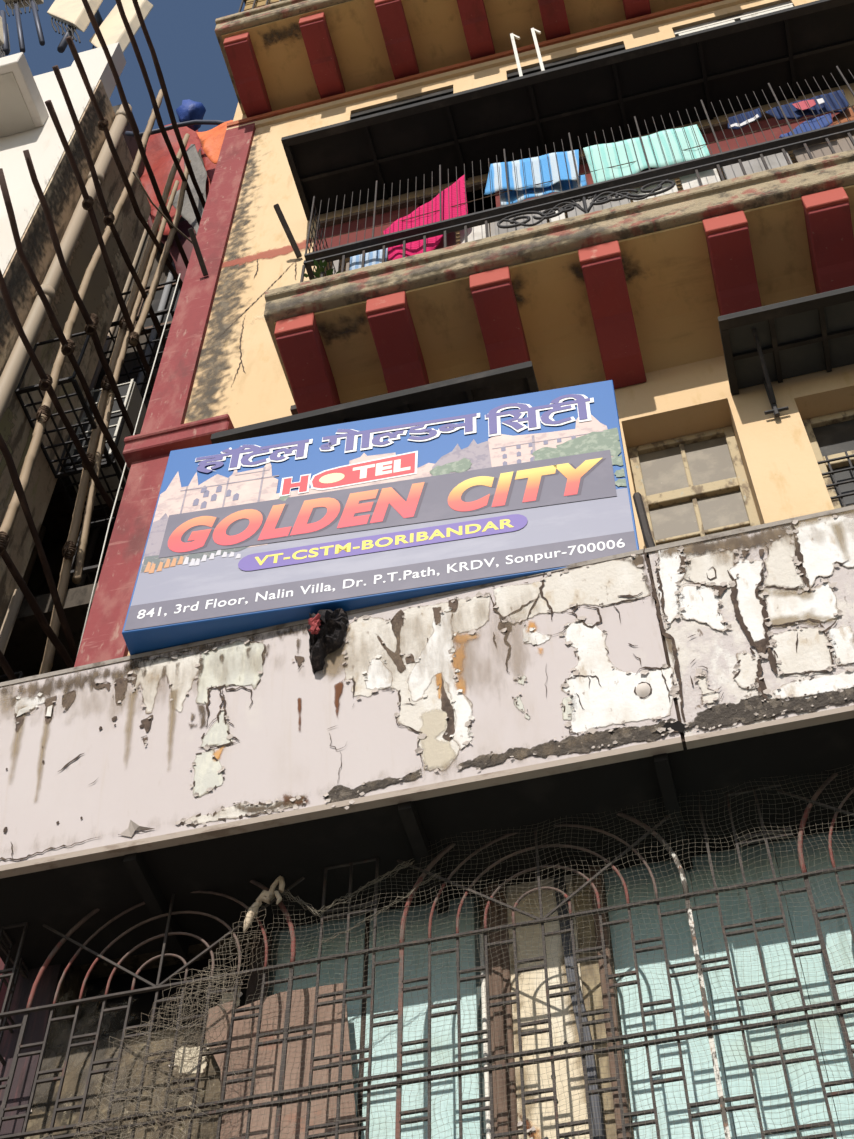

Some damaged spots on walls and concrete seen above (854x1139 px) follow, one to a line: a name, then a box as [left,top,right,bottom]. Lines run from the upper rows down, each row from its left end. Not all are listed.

leakage [0,90,106,347]
leakage [49,199,123,375]
leakage [185,135,259,421]
crack [217,259,296,383]
leakage [265,226,612,310]
leakage [38,722,48,780]
peeling [14,690,76,732]
leakage [1,639,230,757]
peeling [91,639,266,746]
peeling [190,709,233,797]
peeling [175,795,306,827]
peeling [323,515,854,810]